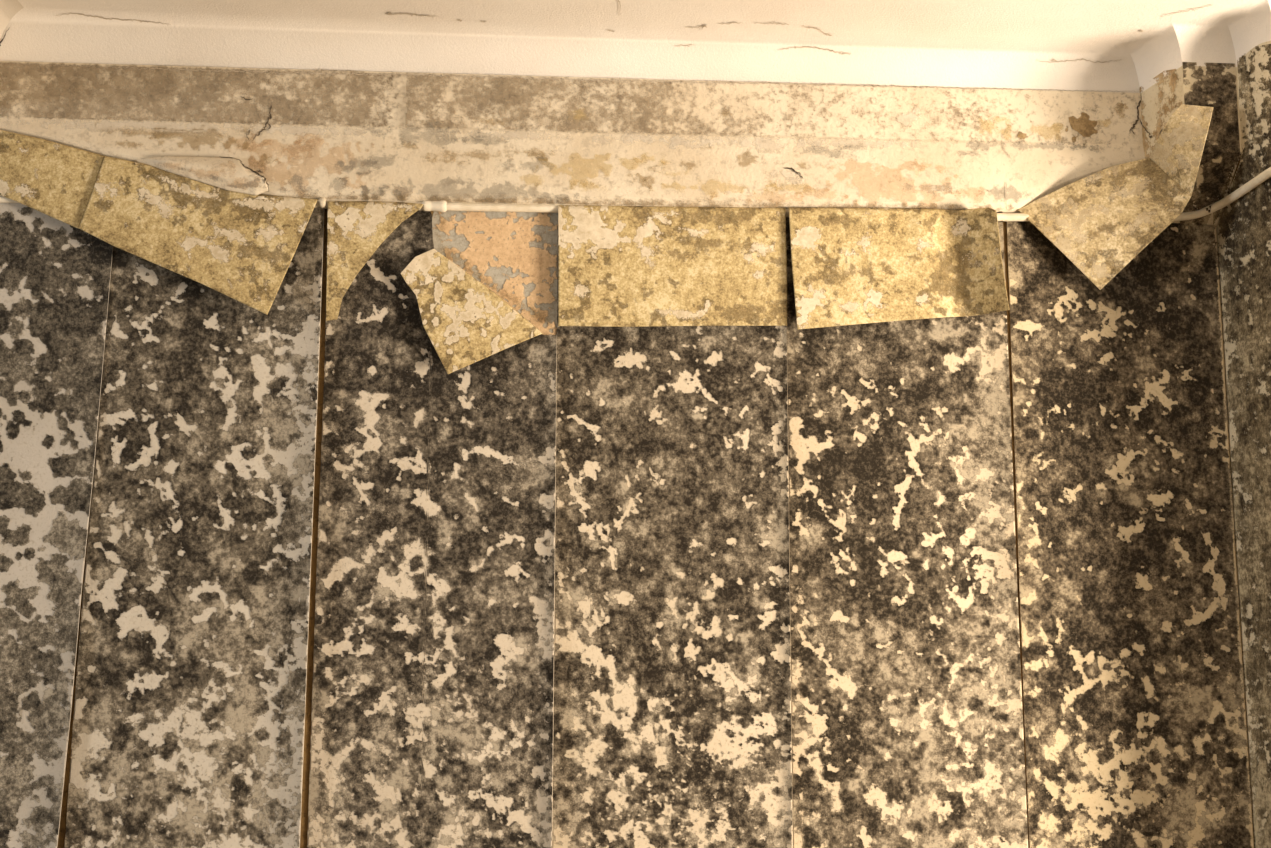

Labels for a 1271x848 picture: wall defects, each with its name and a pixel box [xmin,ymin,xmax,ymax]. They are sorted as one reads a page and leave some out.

peeling [42,118,377,136]
damp [0,62,762,135]
spalling [1065,112,1098,145]
peeling [1139,69,1182,158]
peeling [432,211,558,335]
damp [0,177,1271,848]